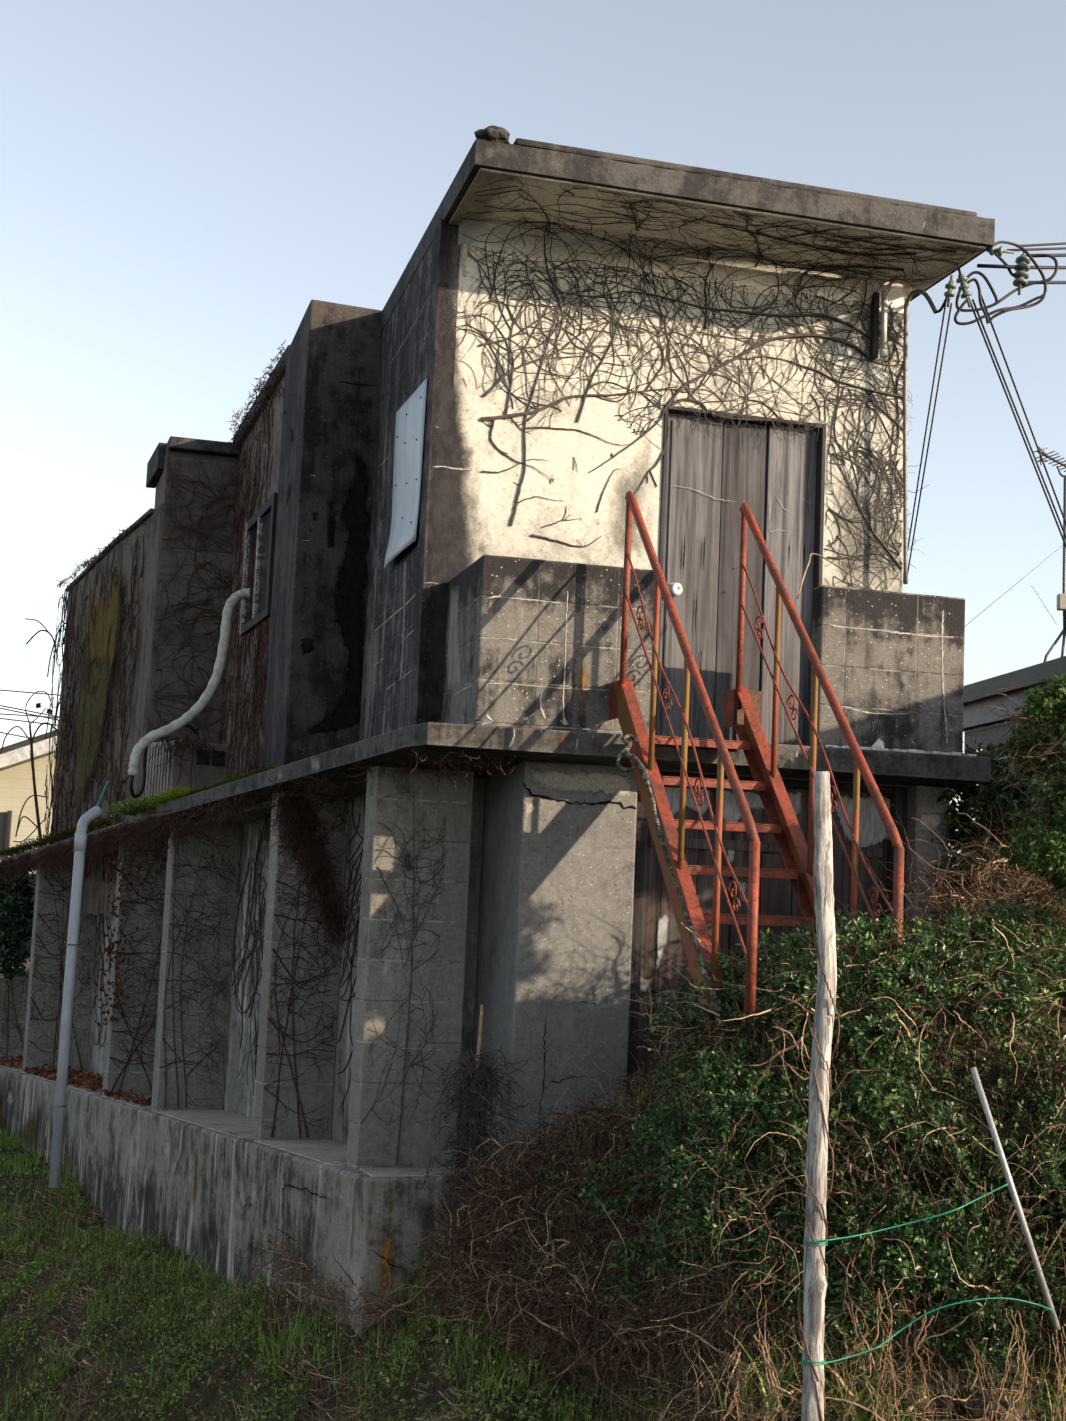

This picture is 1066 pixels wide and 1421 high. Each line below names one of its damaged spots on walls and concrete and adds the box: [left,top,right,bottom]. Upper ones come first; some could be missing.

water stain [308,455,415,735]
crack [523,783,636,810]
crack [512,1014,595,1140]